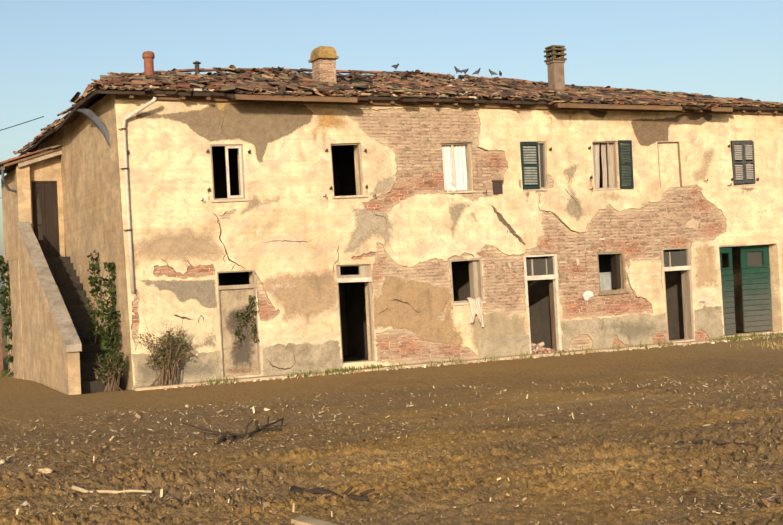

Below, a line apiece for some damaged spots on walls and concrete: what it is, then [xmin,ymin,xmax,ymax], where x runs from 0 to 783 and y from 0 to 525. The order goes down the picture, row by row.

crack [212,212,245,271]
flaking render [342,107,727,321]
flaking render [130,263,217,350]
flaking render [254,270,280,322]